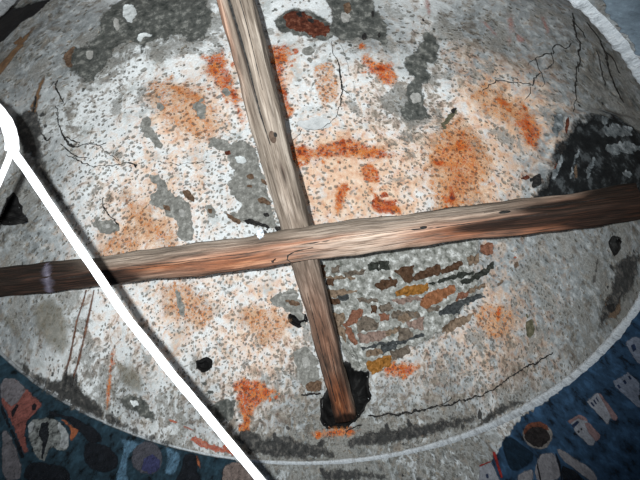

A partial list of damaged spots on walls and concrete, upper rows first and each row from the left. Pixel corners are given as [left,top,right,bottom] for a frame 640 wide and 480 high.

crack [36,80,137,168]
rust [150,52,242,139]
crack [292,41,349,143]
rust [290,139,401,214]
rust [362,56,396,84]
rust [421,118,491,210]
rust [471,83,539,150]
crack [482,13,624,112]
spalling [521,102,640,197]
spalling [289,238,494,430]
rust [233,377,278,431]
crack [346,352,553,433]